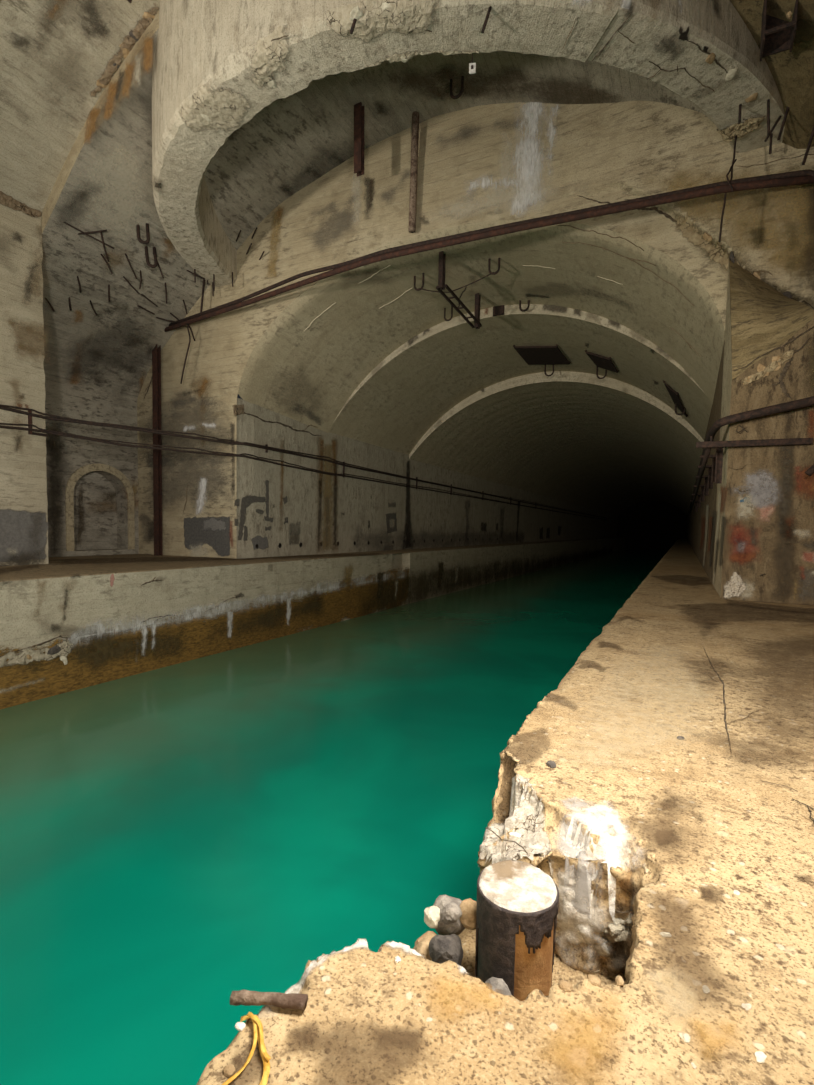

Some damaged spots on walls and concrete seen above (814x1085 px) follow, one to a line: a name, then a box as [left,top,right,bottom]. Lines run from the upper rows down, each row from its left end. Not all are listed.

spalling [325,0,439,43]
spalling [250,25,289,89]
spalling [365,50,479,68]
spalling [179,81,252,131]
water stain [394,68,615,212]
spalling [0,191,42,217]
spalling [732,326,814,385]
water stain [0,549,612,709]
crack [691,649,759,750]
spalling [478,774,553,875]
spalling [601,910,633,955]